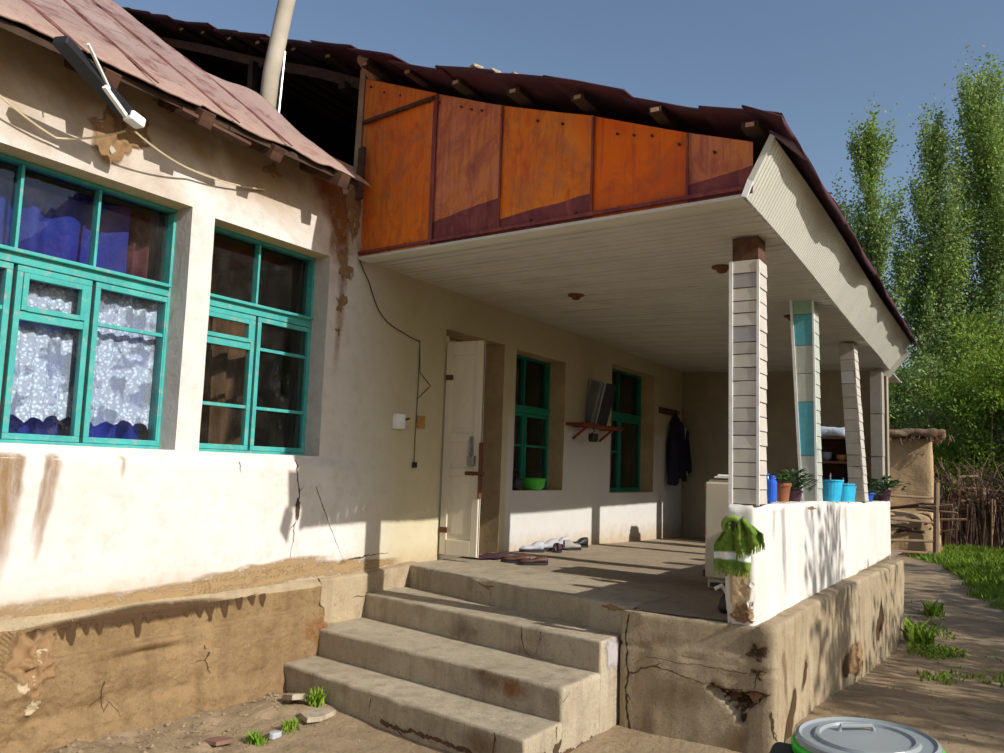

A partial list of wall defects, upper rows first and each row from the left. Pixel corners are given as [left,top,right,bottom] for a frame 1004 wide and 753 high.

rust [319,178,349,255]
damp [0,455,23,540]
crack [288,461,384,564]
flaking render [0,556,394,618]
flaking render [729,570,755,624]
spalling [876,600,884,641]
spalling [2,629,62,716]
crack [624,613,757,729]
spalling [705,644,773,722]
spalling [842,642,864,677]
spalling [380,719,472,753]